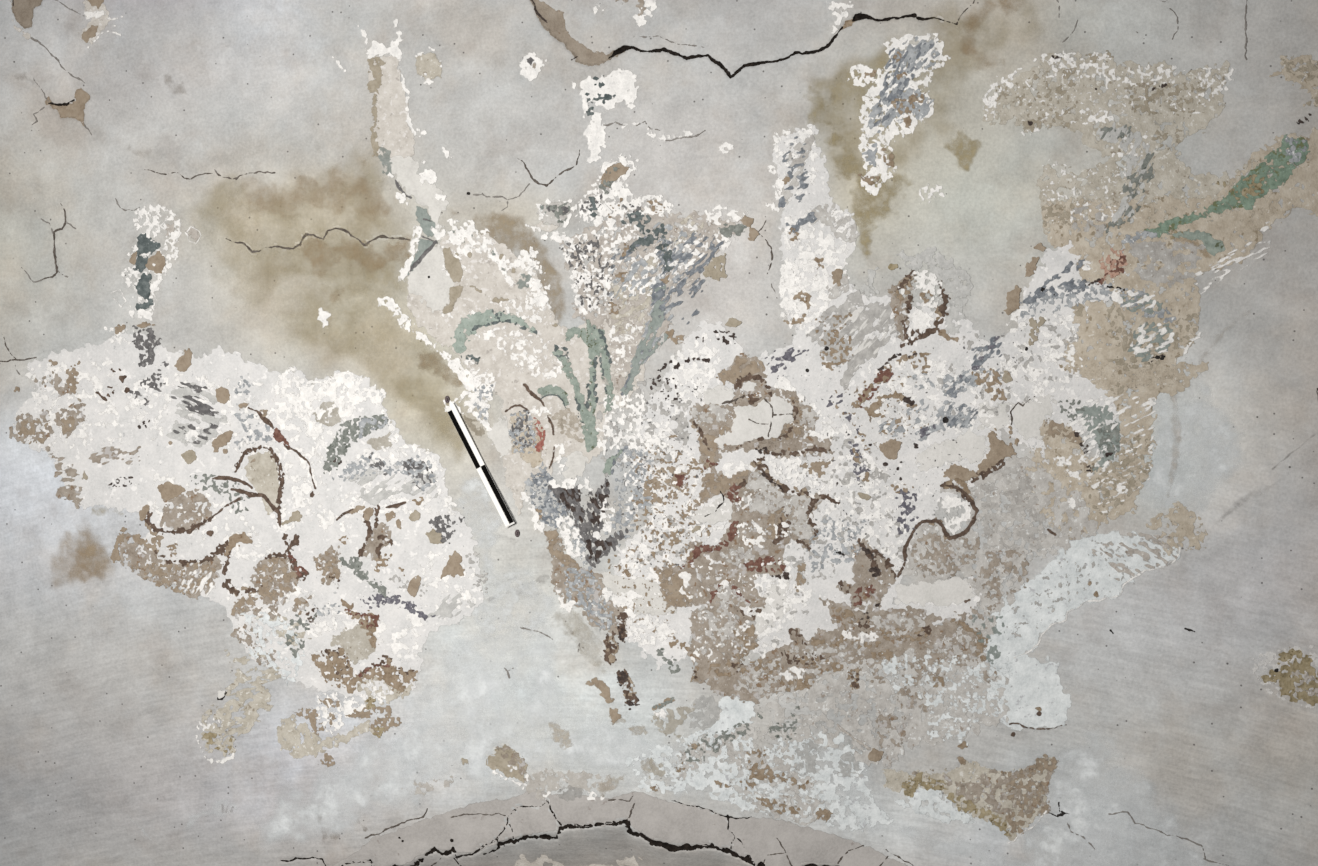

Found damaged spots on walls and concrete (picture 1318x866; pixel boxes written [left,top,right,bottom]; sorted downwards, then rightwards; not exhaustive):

flaking render [10,0,42,40]
crack [571,1,974,78]
flaking render [45,88,90,126]
leakage [813,54,891,117]
leakage [948,140,977,170]
leakage [831,134,900,255]
crack [21,203,76,283]
peeling [104,204,201,345]
crack [226,228,410,253]
flaking render [358,0,1318,843]
flaking render [9,348,476,767]
crack [281,796,913,866]